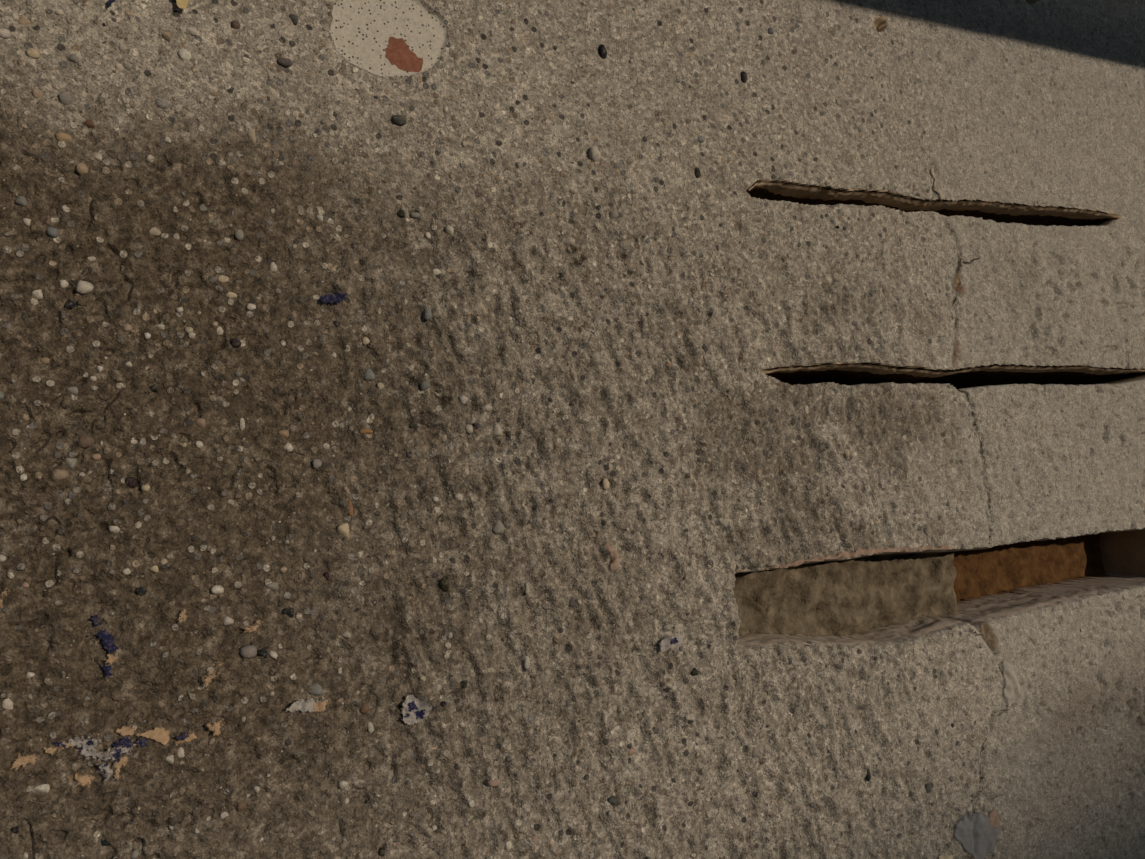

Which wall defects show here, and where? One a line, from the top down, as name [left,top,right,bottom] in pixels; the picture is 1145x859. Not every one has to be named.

crack [952,242,980,327]
crack [957,389,983,453]
peeling [975,621,999,649]
crack [973,709,1009,813]